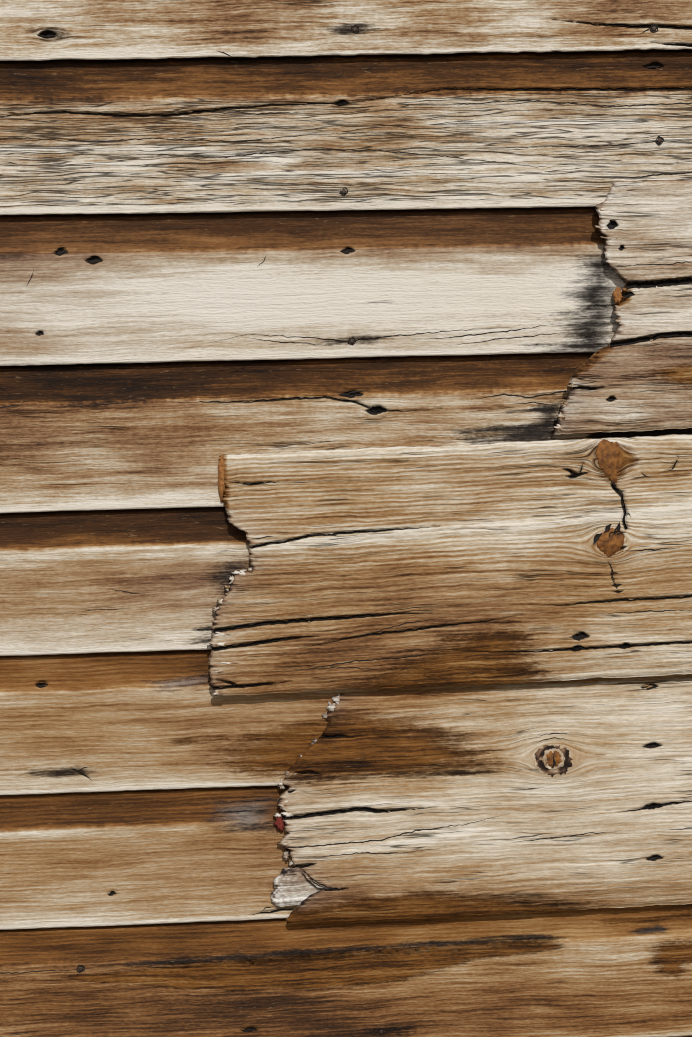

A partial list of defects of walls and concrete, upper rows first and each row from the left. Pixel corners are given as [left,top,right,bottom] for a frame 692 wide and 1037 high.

water stain [533,255,617,352]
crack [175,389,442,412]
crack [480,386,603,406]
crack [552,457,692,614]
peeling [212,567,254,612]
crack [213,613,692,689]
peeling [322,694,340,718]
crack [321,732,353,740]
peeling [273,771,299,866]
crack [284,772,509,890]
crack [513,801,692,843]